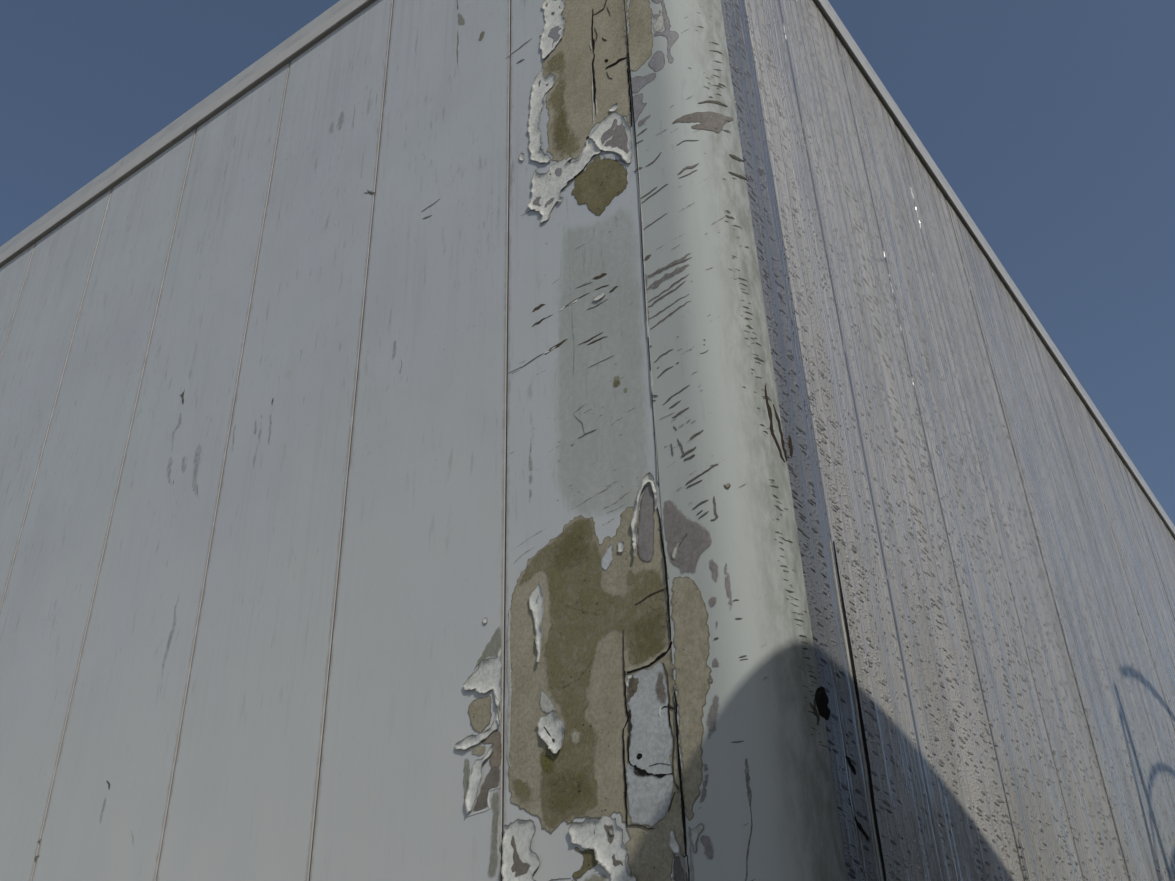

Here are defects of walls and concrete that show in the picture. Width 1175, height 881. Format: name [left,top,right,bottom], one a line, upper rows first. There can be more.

peeling [519,0,679,223]
crack [586,0,632,139]
peeling [455,472,732,881]
crack [622,507,687,857]